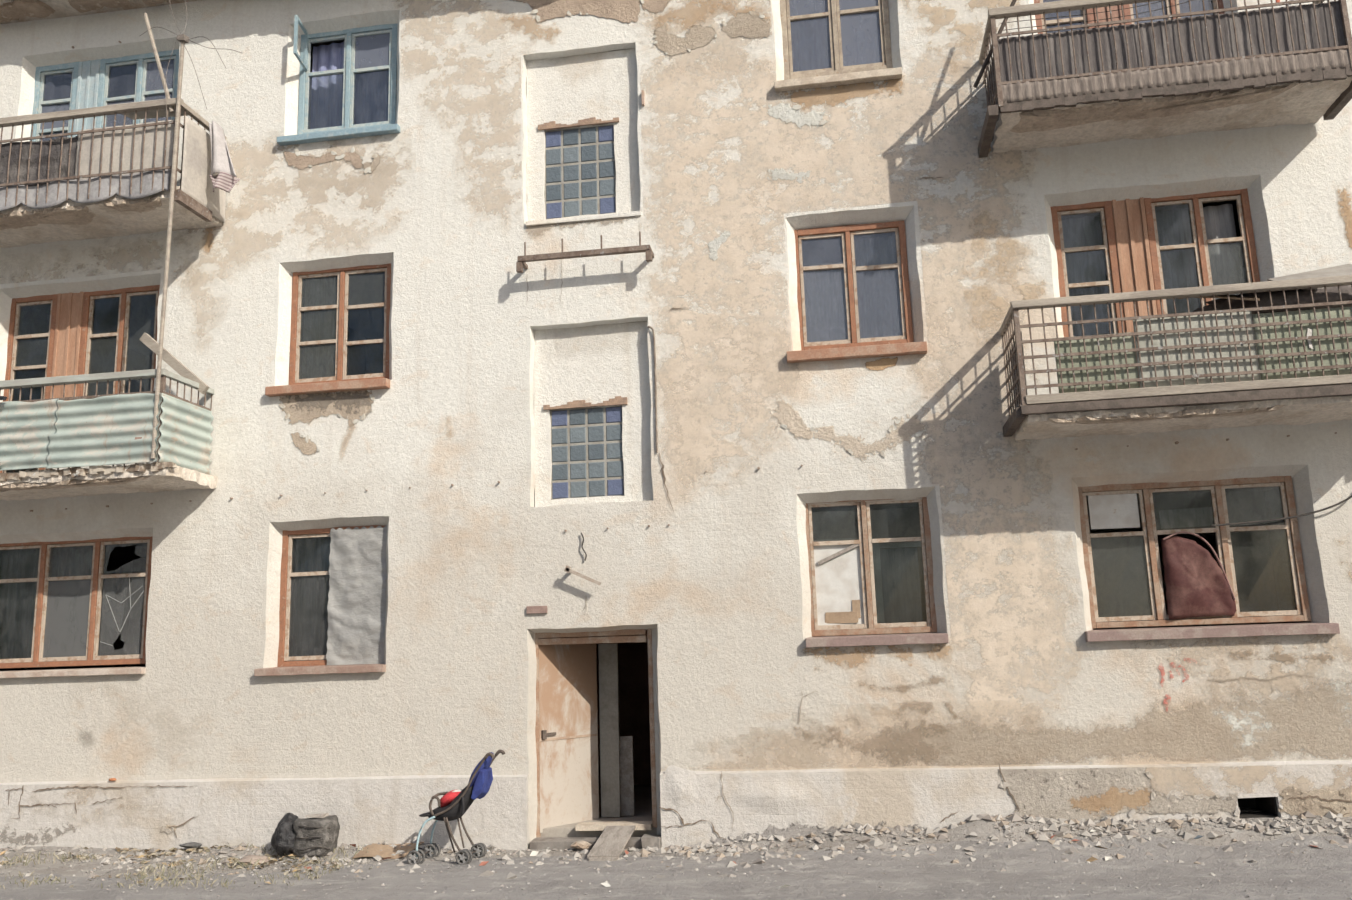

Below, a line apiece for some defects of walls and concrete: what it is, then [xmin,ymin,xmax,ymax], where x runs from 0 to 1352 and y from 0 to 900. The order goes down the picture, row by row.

peeling [402,0,522,213]
spalling [1010,82,1298,133]
peeling [192,145,398,298]
peeling [513,0,1082,739]
peeling [279,390,375,455]
spalling [1048,405,1285,424]
spalling [0,462,177,492]
crack [659,453,674,512]
water stain [708,637,1352,769]
crack [5,785,198,838]
crack [659,771,734,839]